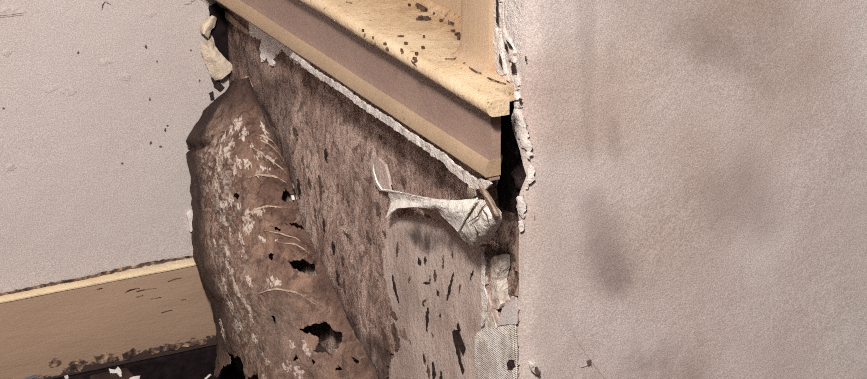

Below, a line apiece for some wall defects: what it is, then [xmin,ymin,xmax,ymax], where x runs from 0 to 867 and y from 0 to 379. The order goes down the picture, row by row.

flaking render [190,16,232,100]
flaking render [290,0,540,379]
peeling [49,339,207,379]